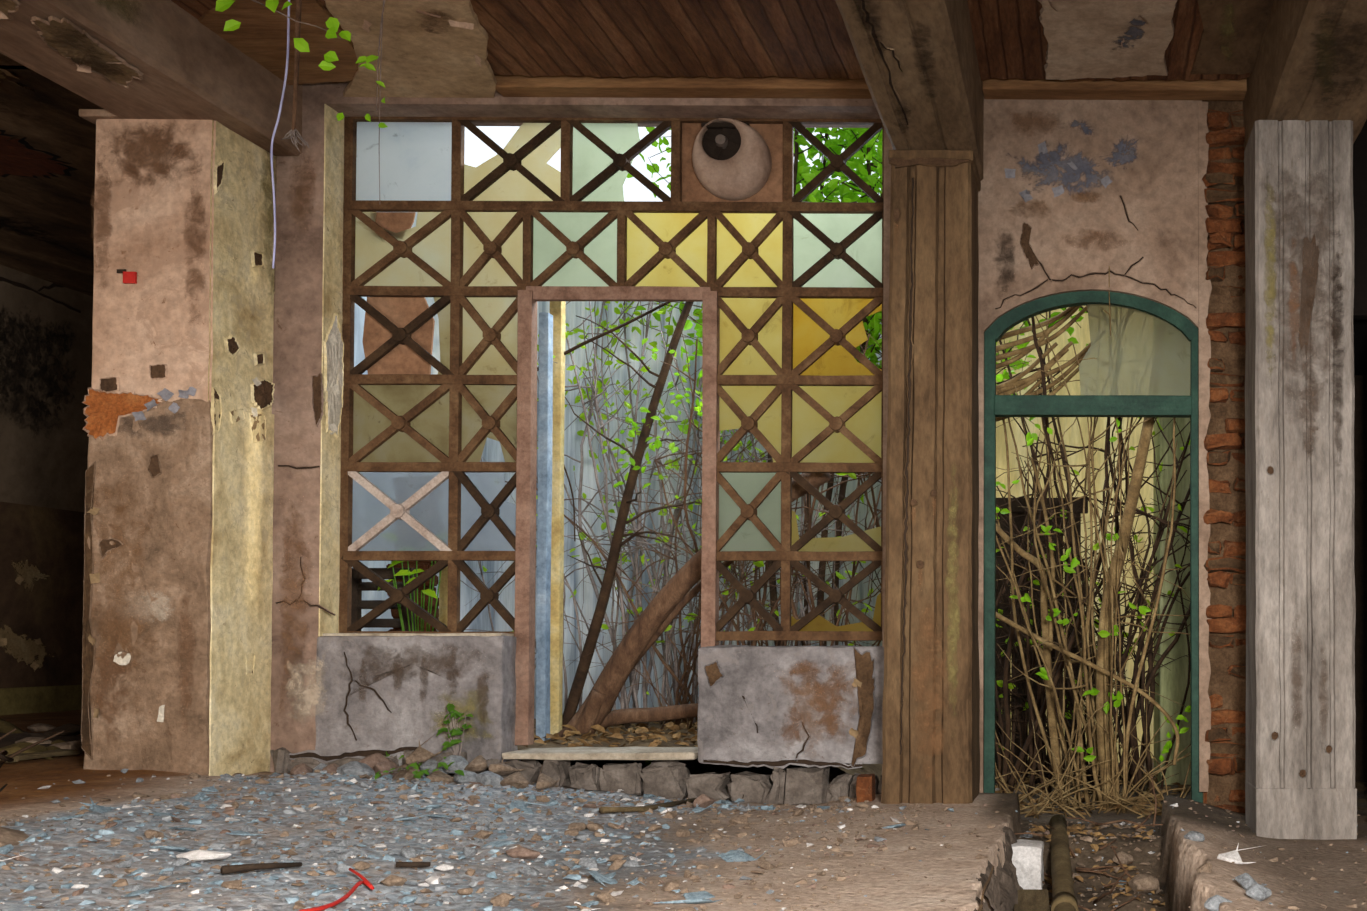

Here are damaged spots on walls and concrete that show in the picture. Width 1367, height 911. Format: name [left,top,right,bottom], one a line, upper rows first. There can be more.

peeling [0,0,144,88]
peeling [991,114,1139,270]
crack [995,184,1197,310]
spalling [82,334,275,444]
spalling [1198,102,1246,813]
crack [275,557,336,616]
peeling [0,624,54,672]
crack [289,651,419,763]
rust [789,663,855,730]